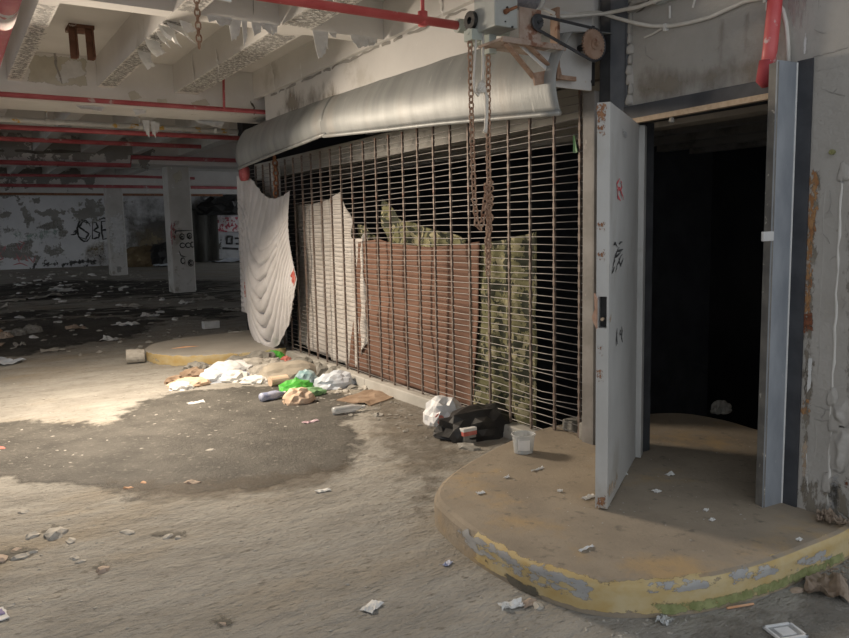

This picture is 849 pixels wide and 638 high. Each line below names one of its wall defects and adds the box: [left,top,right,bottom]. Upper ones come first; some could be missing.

peeling [138,20,196,70]
peeling [206,14,278,46]
peeling [128,91,159,138]
peeling [0,133,155,263]
rust [803,170,819,333]
peeling [458,529,593,600]
peeling [648,579,710,593]